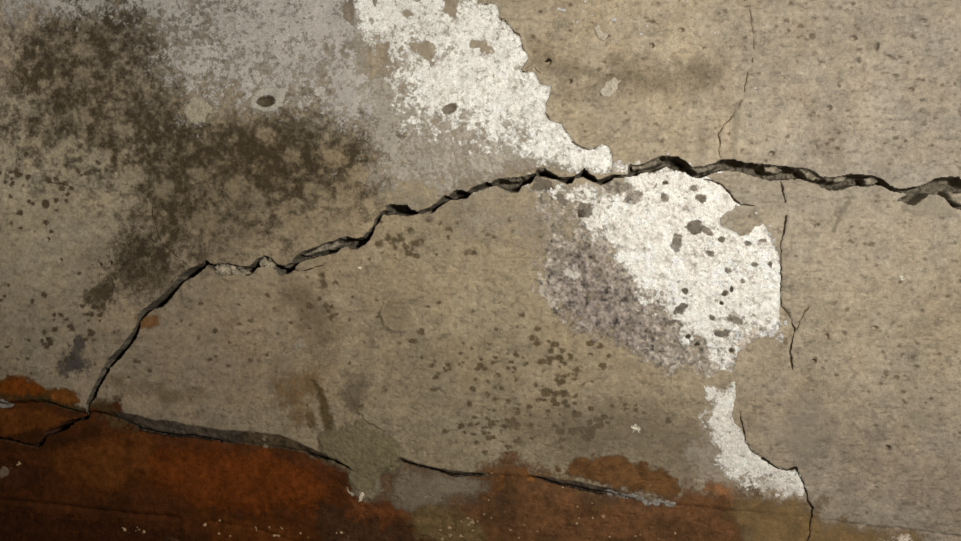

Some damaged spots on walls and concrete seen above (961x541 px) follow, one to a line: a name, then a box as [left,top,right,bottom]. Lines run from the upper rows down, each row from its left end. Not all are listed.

water stain [0,0,380,378]
water stain [375,227,423,258]
crack [0,72,961,449]
spalling [343,0,787,379]
corrosion [0,373,434,541]
corrosion [452,452,759,541]
peeling [732,403,812,503]
crack [740,413,814,541]